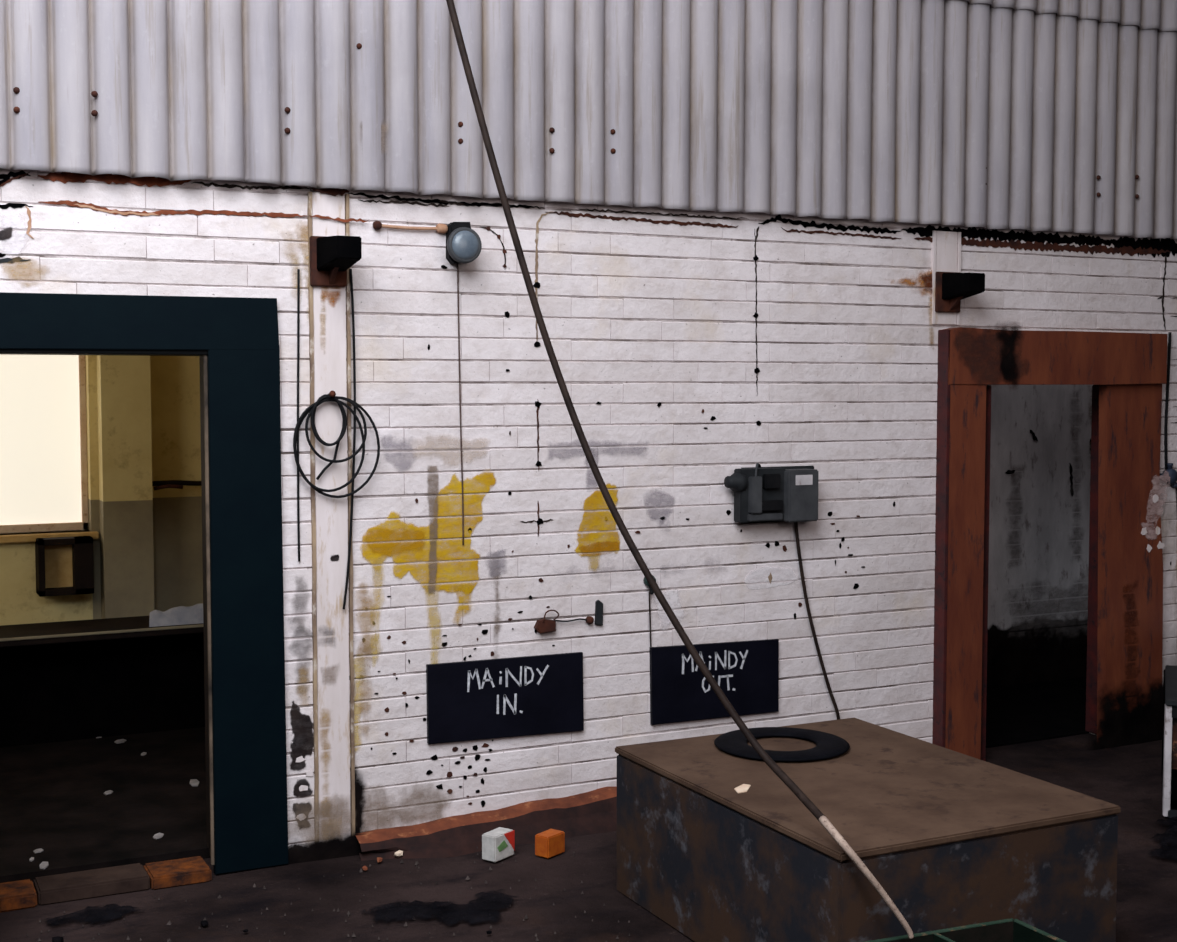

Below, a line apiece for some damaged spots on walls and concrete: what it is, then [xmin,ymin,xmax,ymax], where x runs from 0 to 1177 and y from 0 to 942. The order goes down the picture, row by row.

crack [0,170,1177,426]
corrosion [902,272,933,344]
crack [534,401,542,471]
crack [520,502,553,536]